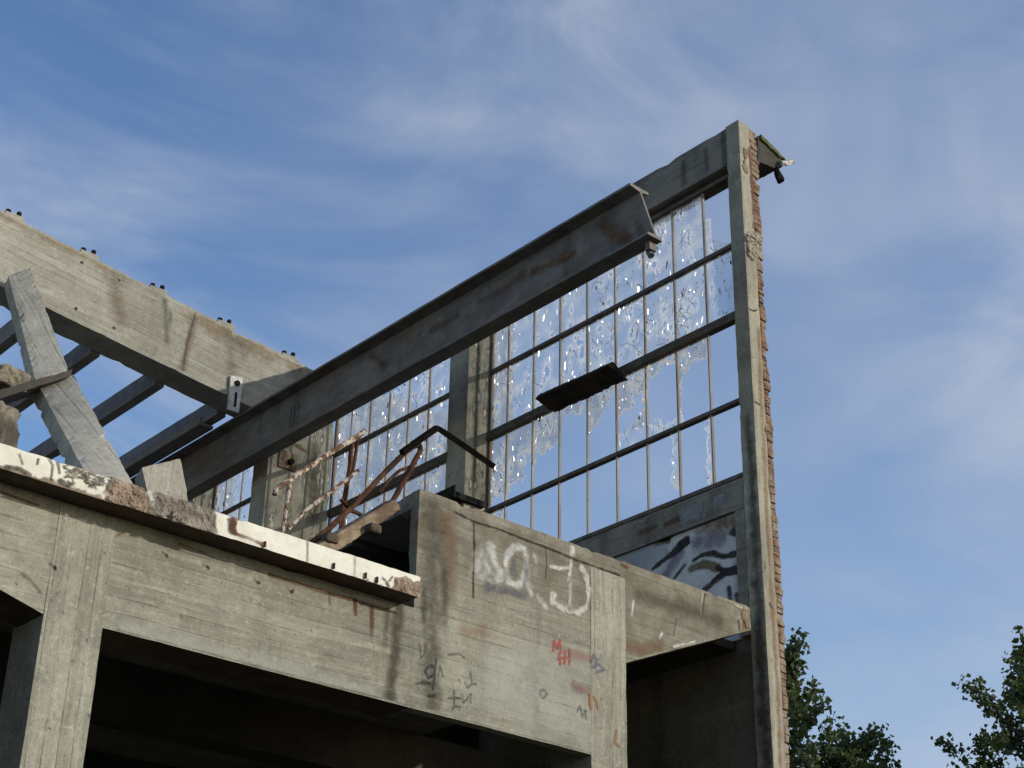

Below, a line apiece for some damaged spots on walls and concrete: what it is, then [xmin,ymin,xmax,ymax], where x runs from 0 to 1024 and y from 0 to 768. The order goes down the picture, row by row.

spalling [744,231,764,260]
spalling [0,454,218,535]
rust [230,516,264,546]
rust [268,573,396,629]